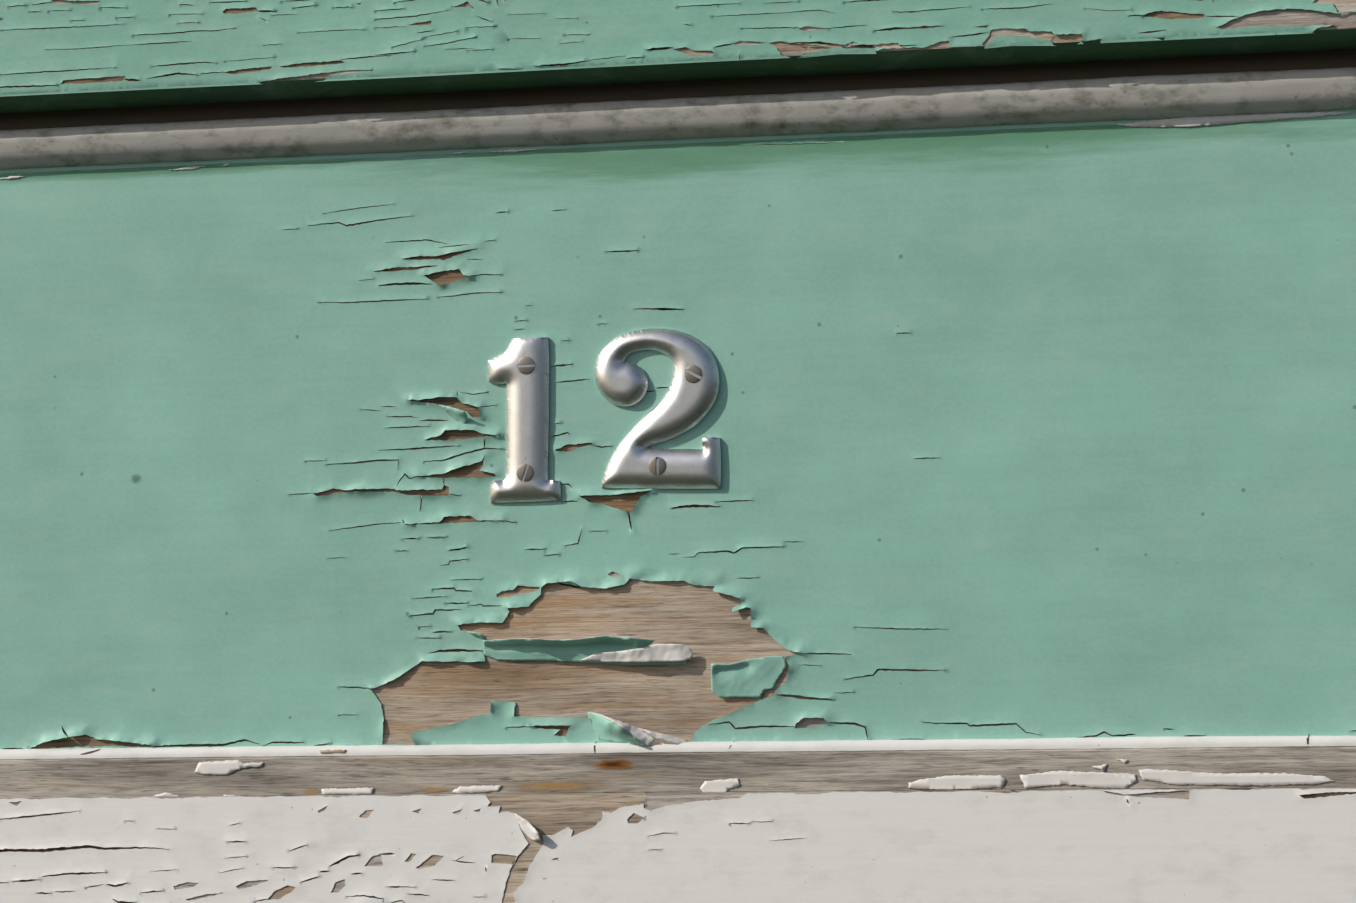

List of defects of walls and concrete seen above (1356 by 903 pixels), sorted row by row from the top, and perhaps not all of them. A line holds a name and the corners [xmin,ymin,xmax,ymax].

peeling [1130,0,1356,30]
peeling [647,25,1101,57]
crack [284,204,505,260]
crack [327,279,531,330]
crack [639,305,684,313]
crack [310,406,498,485]
crack [526,483,602,556]
crack [672,500,752,508]
peeling [371,571,868,746]
peeling [908,758,1356,803]
peeling [452,778,751,903]
peeling [174,880,296,902]